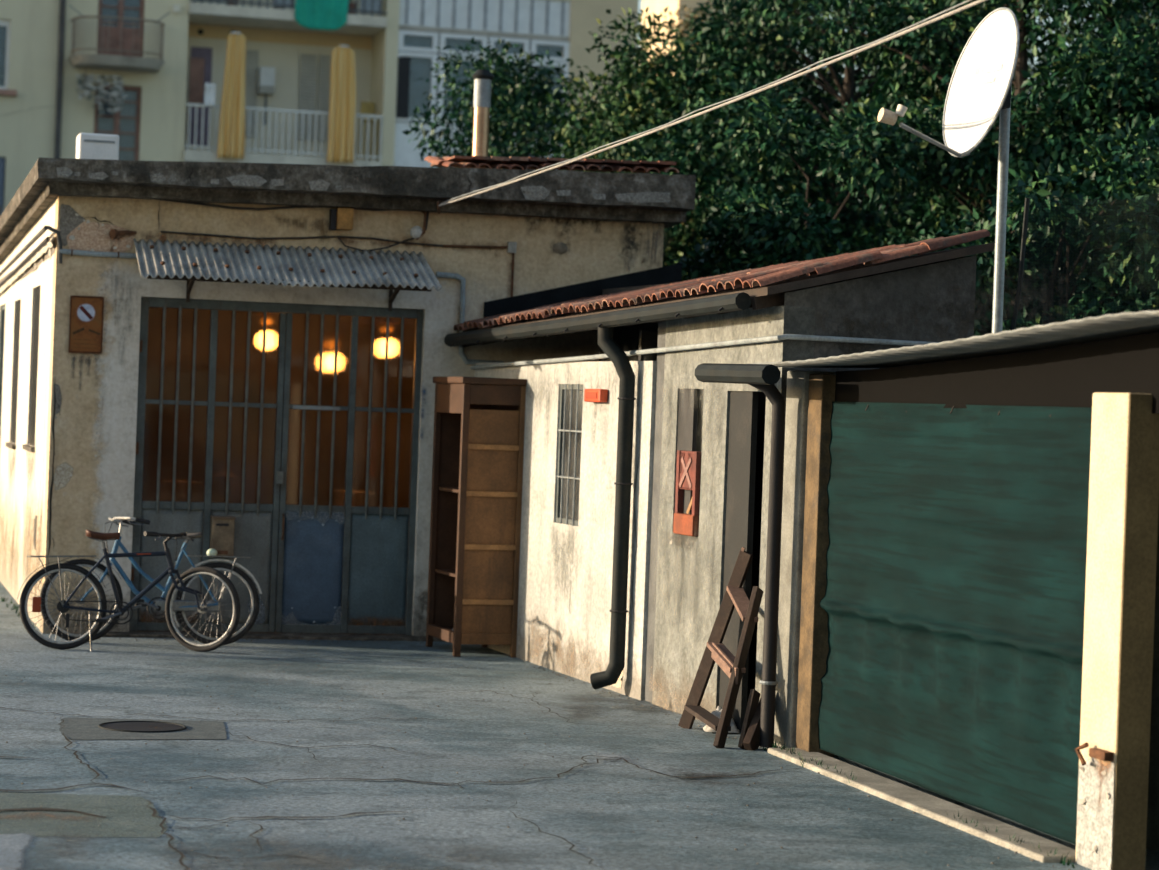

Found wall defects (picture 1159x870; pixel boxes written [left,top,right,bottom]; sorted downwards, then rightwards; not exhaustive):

peeling [0,204,134,288]
crack [0,689,806,870]